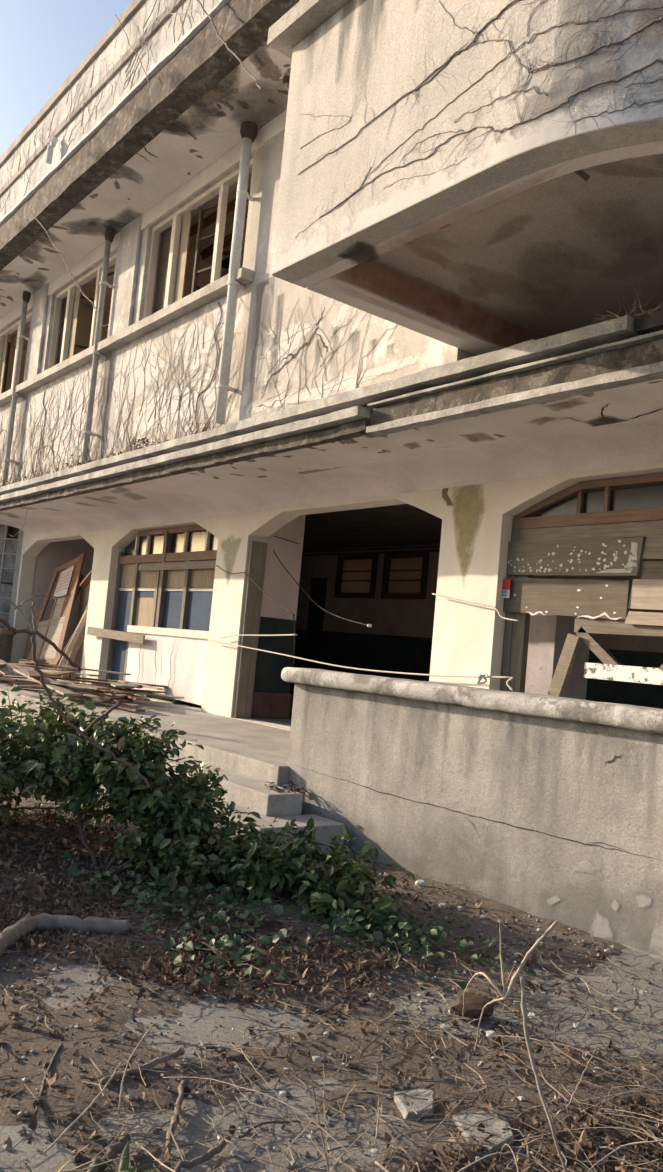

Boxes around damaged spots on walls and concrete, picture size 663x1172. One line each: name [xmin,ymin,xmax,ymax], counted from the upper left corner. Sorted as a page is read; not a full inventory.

water stain [233,86,282,127]
water stain [110,211,134,229]
rust [350,260,546,347]
crack [554,404,662,423]
water stain [454,485,483,571]
crack [294,765,662,861]